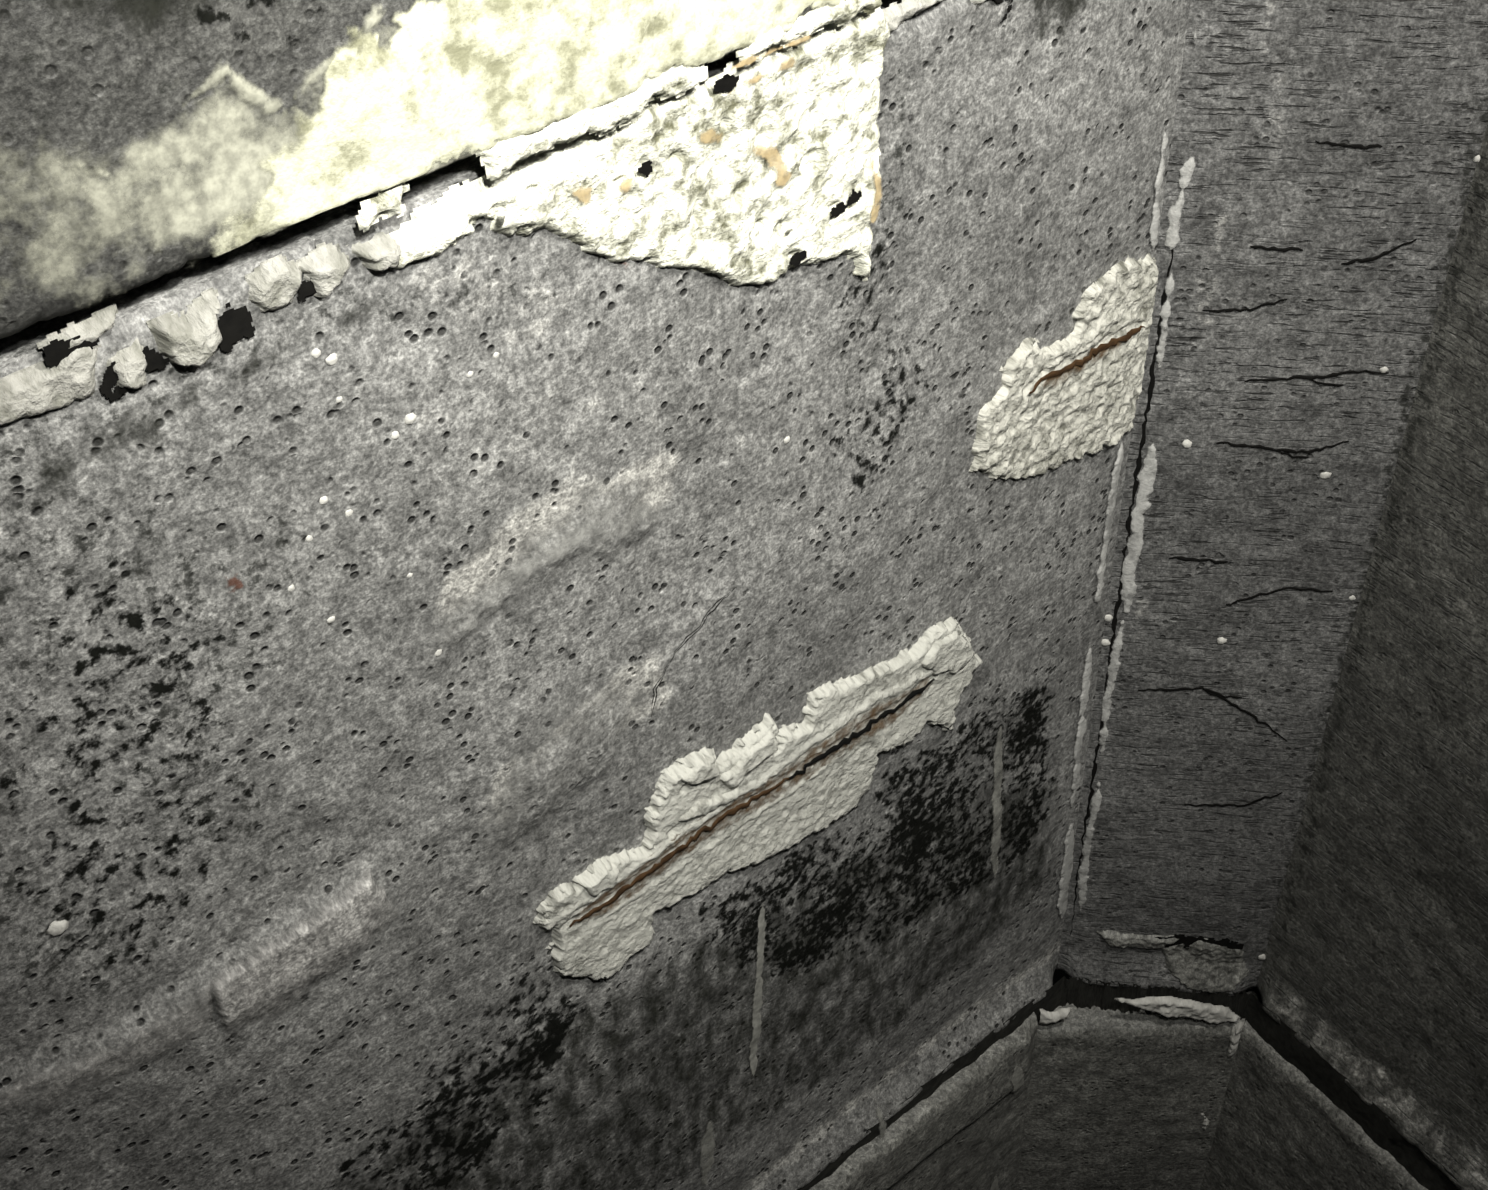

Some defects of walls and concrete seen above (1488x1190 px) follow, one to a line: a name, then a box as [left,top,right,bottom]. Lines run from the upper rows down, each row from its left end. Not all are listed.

damp [1035,0,1084,38]
damp [34,212,77,283]
peeling [245,232,401,312]
crack [1250,244,1303,252]
crack [1341,239,1417,265]
peeling [0,287,223,426]
damp [969,253,1159,481]
crack [1245,370,1389,387]
crack [1217,441,1349,458]
crack [1070,249,1287,935]
damp [17,578,233,966]
damp [332,617,1068,1190]